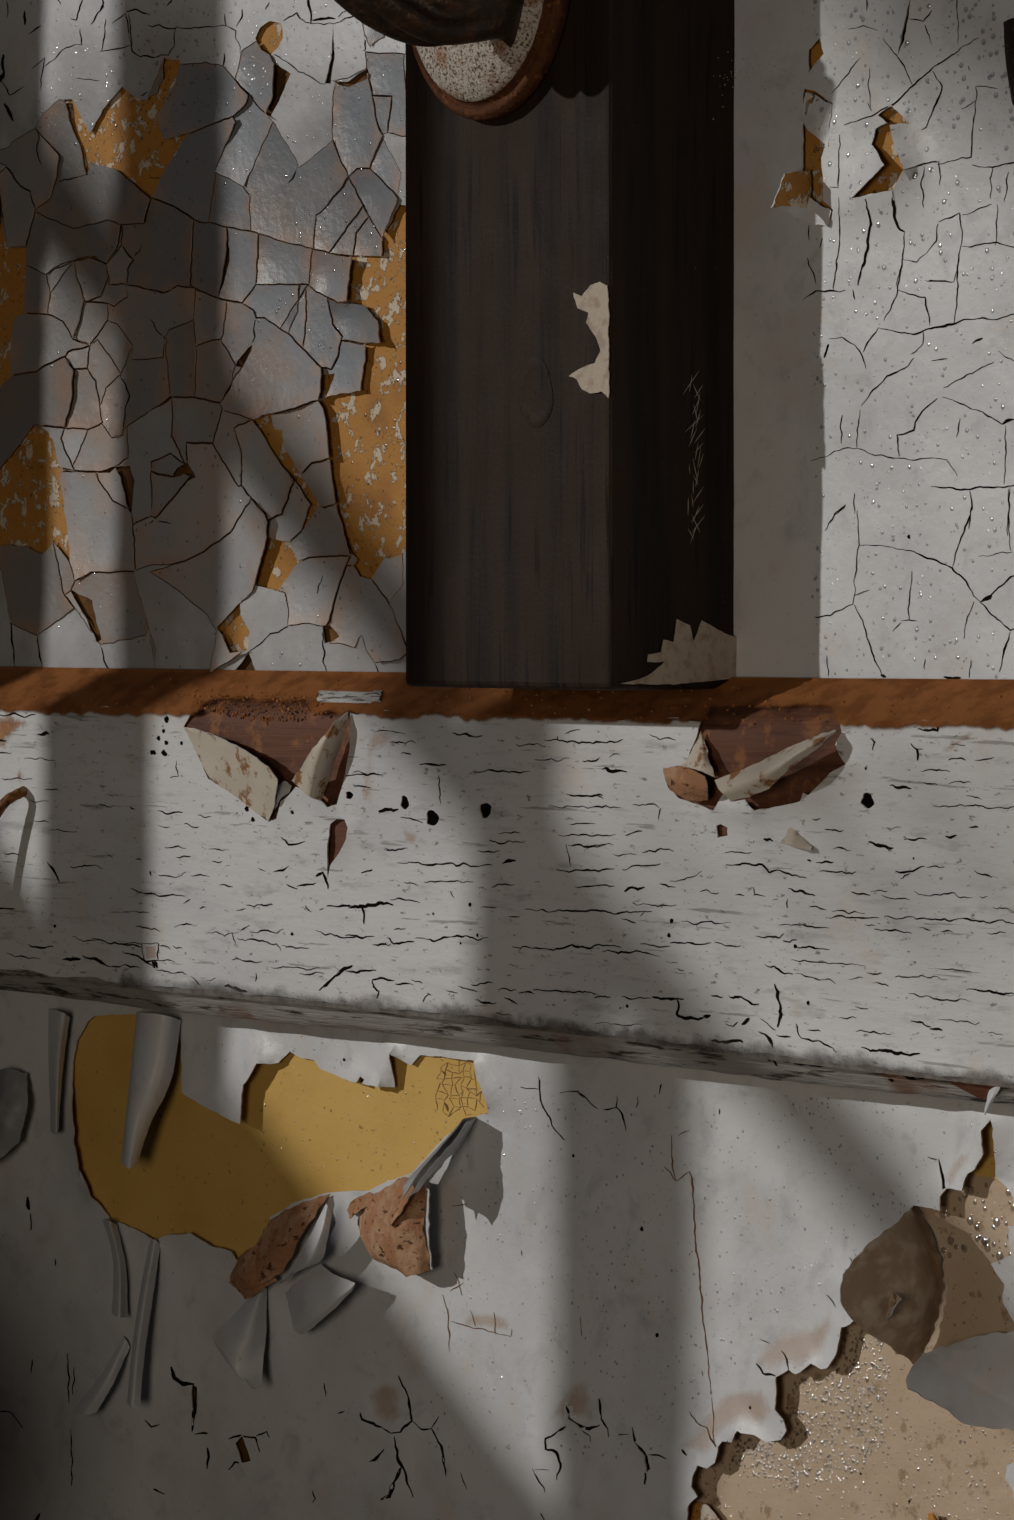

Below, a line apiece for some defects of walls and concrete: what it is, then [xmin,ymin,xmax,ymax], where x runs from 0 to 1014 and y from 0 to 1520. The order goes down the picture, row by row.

crack [0,0,366,182]
peeling [853,107,909,198]
peeling [0,21,406,672]
crack [803,0,1014,679]
peeling [150,712,348,822]
corrosion [0,667,1014,745]
peeling [663,730,836,802]
crack [0,712,1014,1082]
peeling [48,1009,488,1415]
peeling [688,1081,1014,1520]
crack [145,1366,270,1470]
crack [324,1376,467,1500]